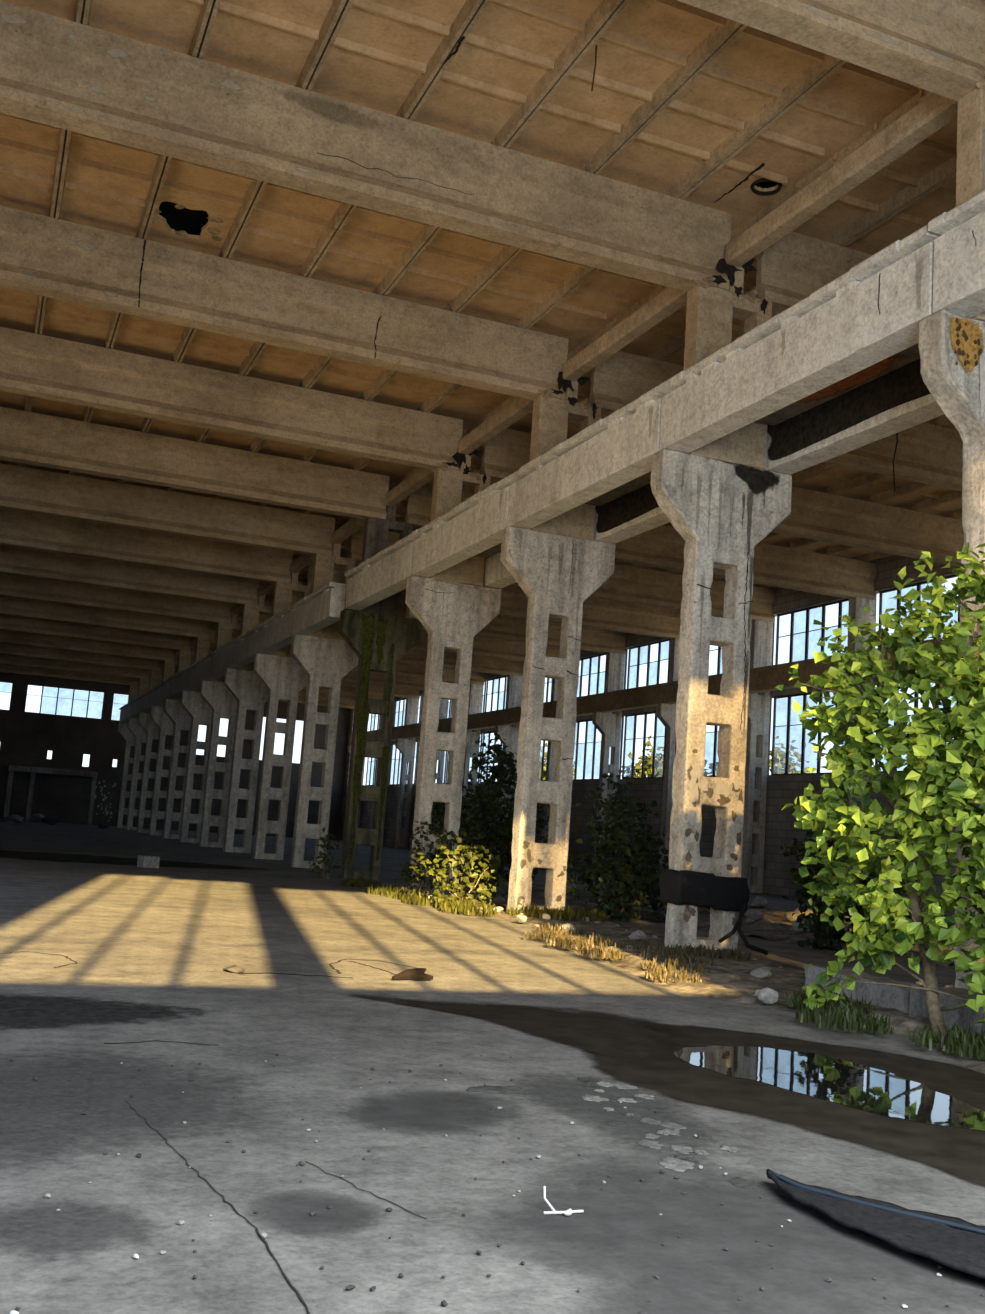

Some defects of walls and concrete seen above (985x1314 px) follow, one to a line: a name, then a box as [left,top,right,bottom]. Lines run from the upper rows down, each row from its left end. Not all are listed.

corrosion [950,317,985,417]
crack [126,1101,310,1314]
crack [305,1161,427,1219]